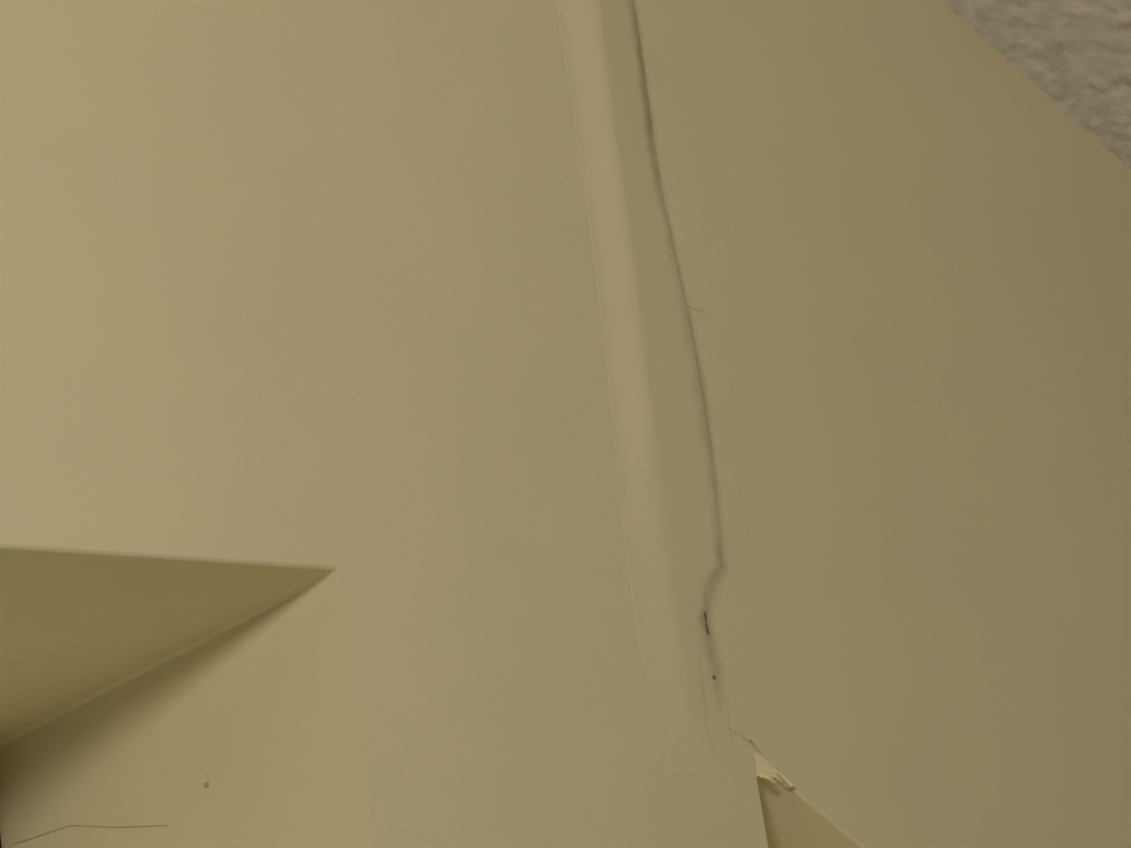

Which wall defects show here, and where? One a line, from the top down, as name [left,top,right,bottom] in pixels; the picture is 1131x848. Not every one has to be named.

crack [702,611,710,635]